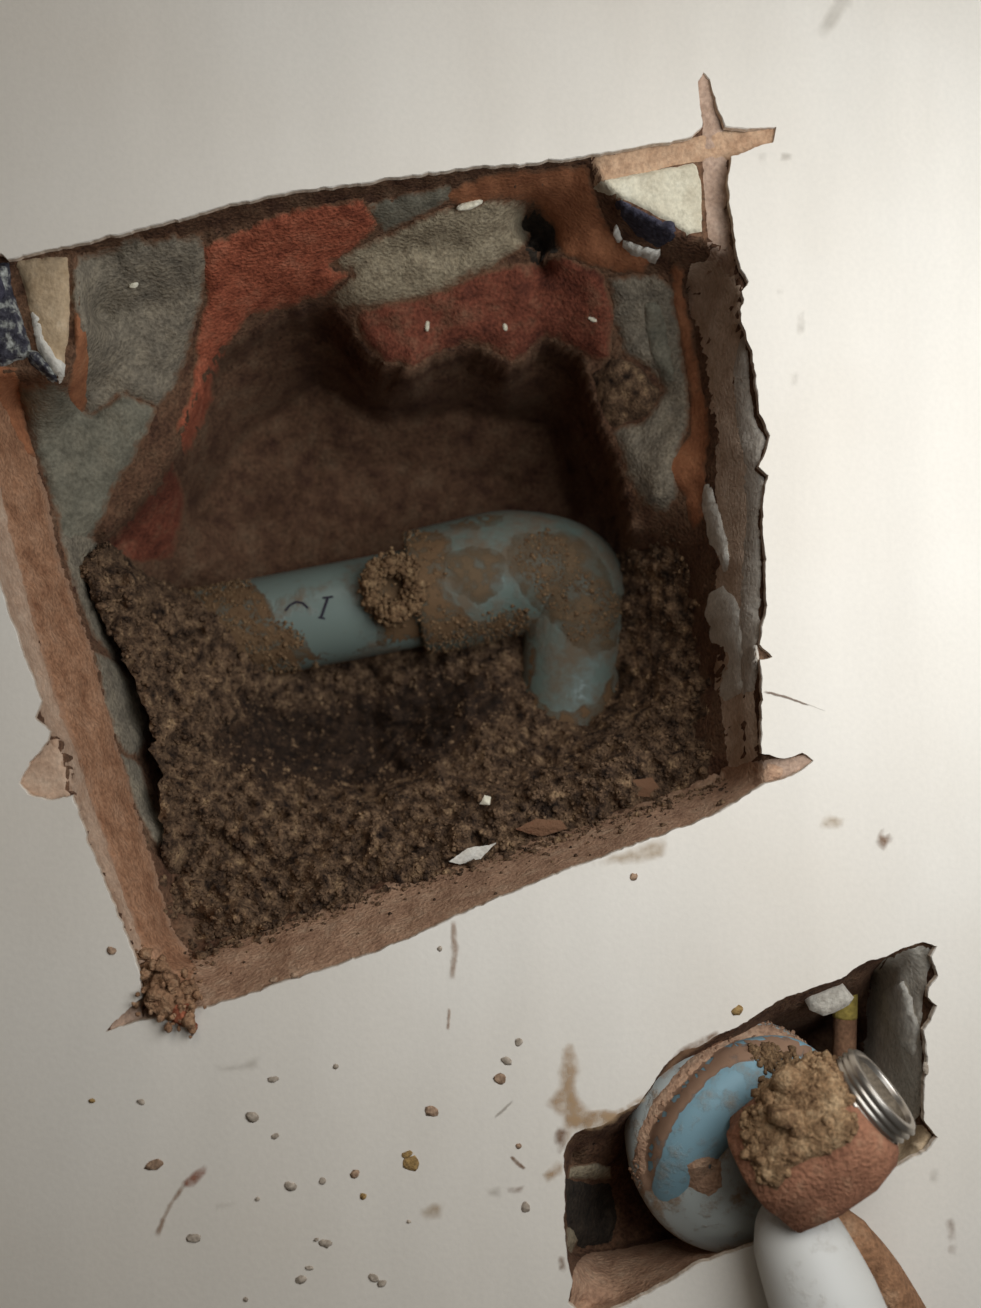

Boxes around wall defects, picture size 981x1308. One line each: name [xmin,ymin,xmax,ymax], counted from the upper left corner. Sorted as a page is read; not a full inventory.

spalling [0,157,804,783]
spalling [21,711,88,799]
spalling [110,706,234,958]
spalling [613,777,668,814]
spalling [563,942,935,1302]